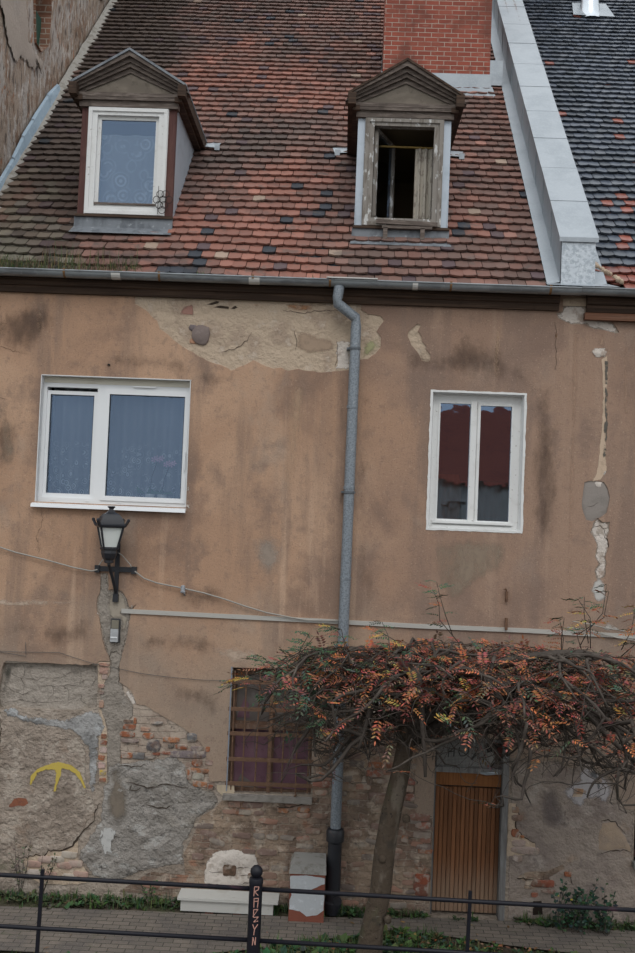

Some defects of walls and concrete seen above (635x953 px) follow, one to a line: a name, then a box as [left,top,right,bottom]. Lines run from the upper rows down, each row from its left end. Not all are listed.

flaking render [0,0,43,69]
flaking render [135,297,384,373]
flaking render [408,324,430,362]
flaking render [558,298,616,332]
flaking render [592,519,609,601]
crack [5,669,95,705]
flaking render [120,685,216,790]
flaking render [0,713,100,885]
crack [119,764,187,809]
flaking render [121,730,397,916]
flaking render [388,746,434,912]
flaking render [506,758,635,924]